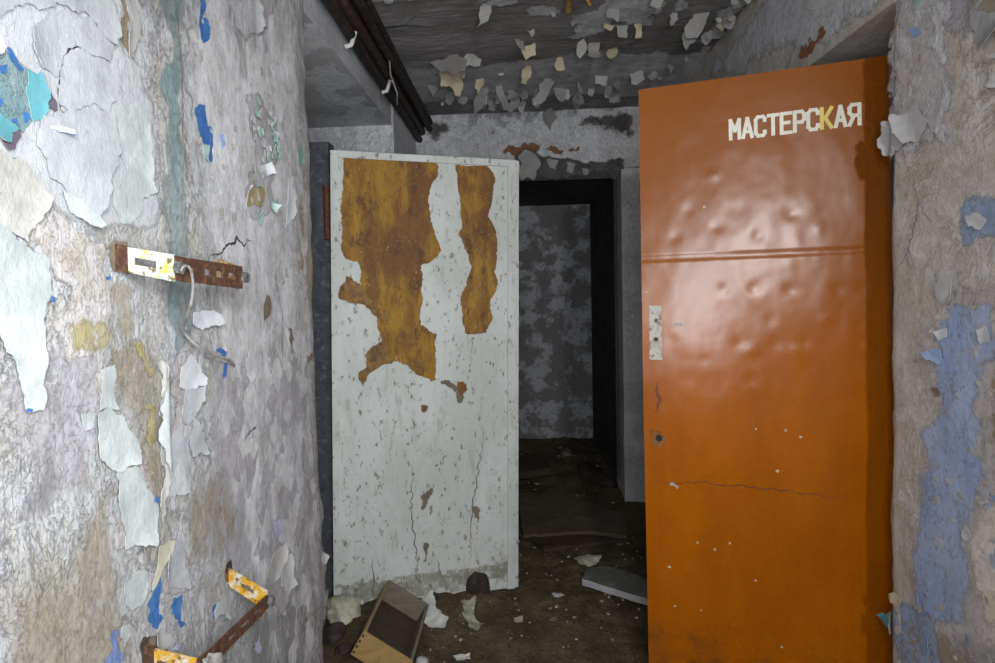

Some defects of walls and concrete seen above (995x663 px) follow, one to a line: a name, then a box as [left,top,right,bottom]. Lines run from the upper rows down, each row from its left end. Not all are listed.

crack [58,46,78,111]
peeling [405,0,879,130]
peeling [877,0,953,158]
peeling [502,143,624,181]
peeling [960,196,995,263]
peeling [0,0,329,663]